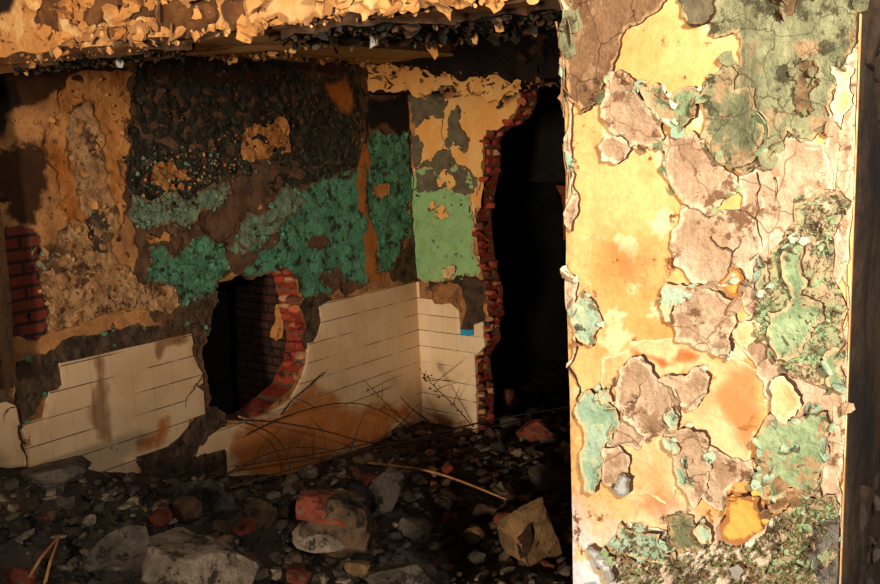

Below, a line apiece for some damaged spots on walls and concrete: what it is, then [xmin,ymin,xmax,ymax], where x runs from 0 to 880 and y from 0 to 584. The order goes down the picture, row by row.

peeling [318,146,341,168]
peeling [444,105,470,154]
flaking render [502,119,523,127]
spalling [308,233,331,253]
peeling [363,117,504,346]
flaking render [278,294,303,313]
peeling [560,265,605,368]
peeling [0,387,11,404]
crack [3,406,28,467]
peeling [136,327,228,476]
corrosion [231,385,410,476]
flaking render [473,350,495,430]